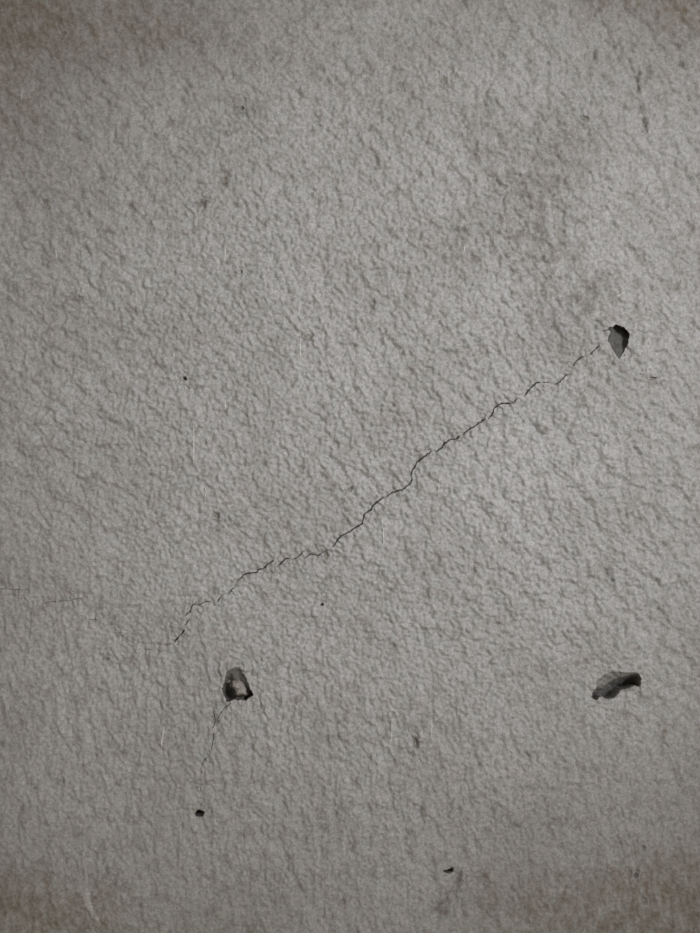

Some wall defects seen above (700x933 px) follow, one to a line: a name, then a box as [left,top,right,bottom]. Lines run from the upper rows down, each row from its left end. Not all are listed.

spalling [601,324,630,359]
crack [43,345,599,650]
spalling [222,667,254,702]
spalling [591,671,642,700]